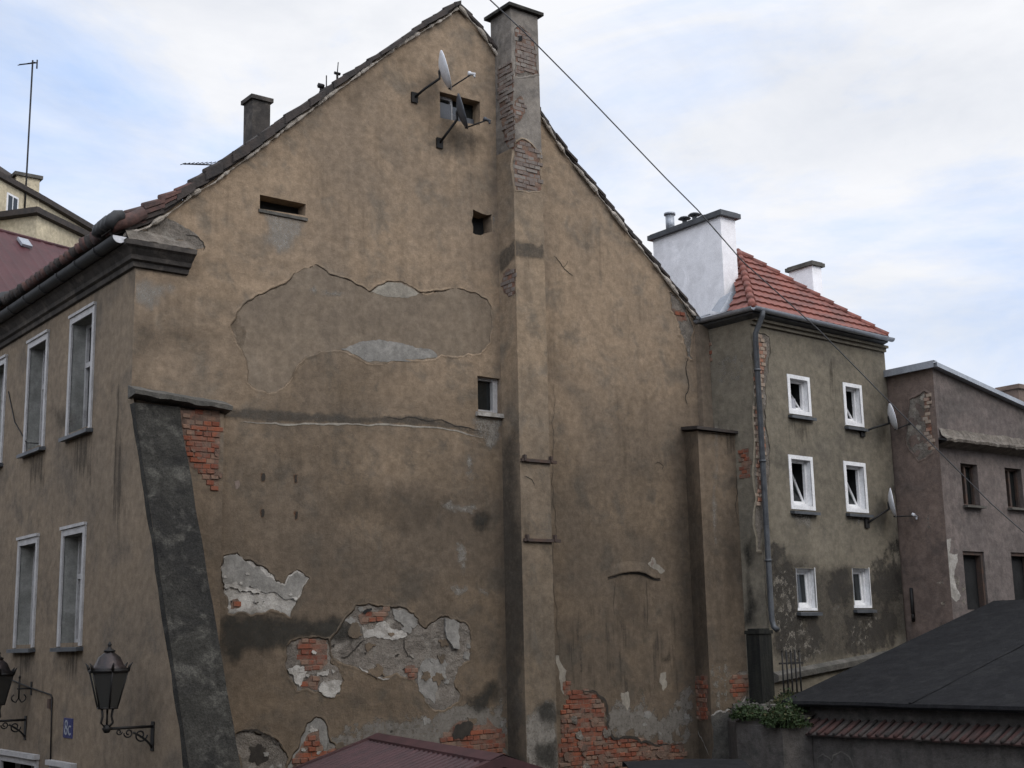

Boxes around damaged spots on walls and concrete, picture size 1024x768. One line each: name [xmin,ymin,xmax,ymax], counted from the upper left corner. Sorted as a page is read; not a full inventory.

spalling [497,24,543,194]
spalling [228,263,494,396]
flaking render [180,409,223,491]
spalling [904,389,936,463]
flaking render [221,550,312,620]
leakage [771,542,824,662]
leakage [826,539,901,654]
spalling [235,602,508,768]
flaking render [526,655,694,768]